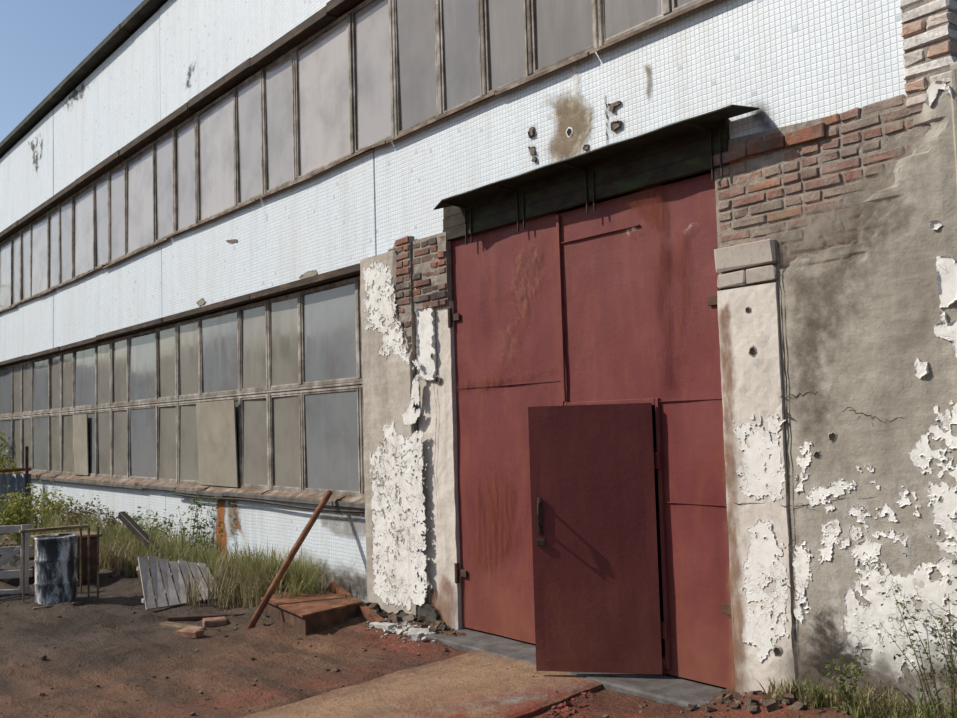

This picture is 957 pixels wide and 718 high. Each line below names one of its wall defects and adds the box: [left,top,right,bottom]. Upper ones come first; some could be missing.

peeling [528,127,537,162]
peeling [550,97,592,161]
spalling [713,80,953,269]
peeling [934,255,957,357]
peeling [321,232,453,622]
crack [733,246,877,657]
crack [841,407,902,427]
peeling [914,357,929,379]
corrosion [215,497,240,558]
peeling [730,400,957,705]